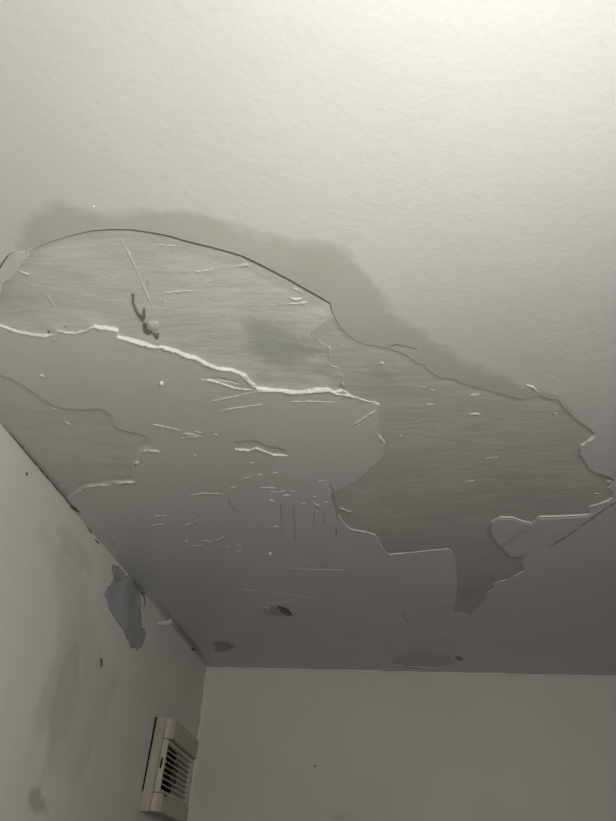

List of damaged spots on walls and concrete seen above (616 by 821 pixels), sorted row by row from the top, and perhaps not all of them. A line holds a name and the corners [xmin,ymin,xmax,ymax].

peeling [105,565,146,650]
peeling [0,229,614,617]